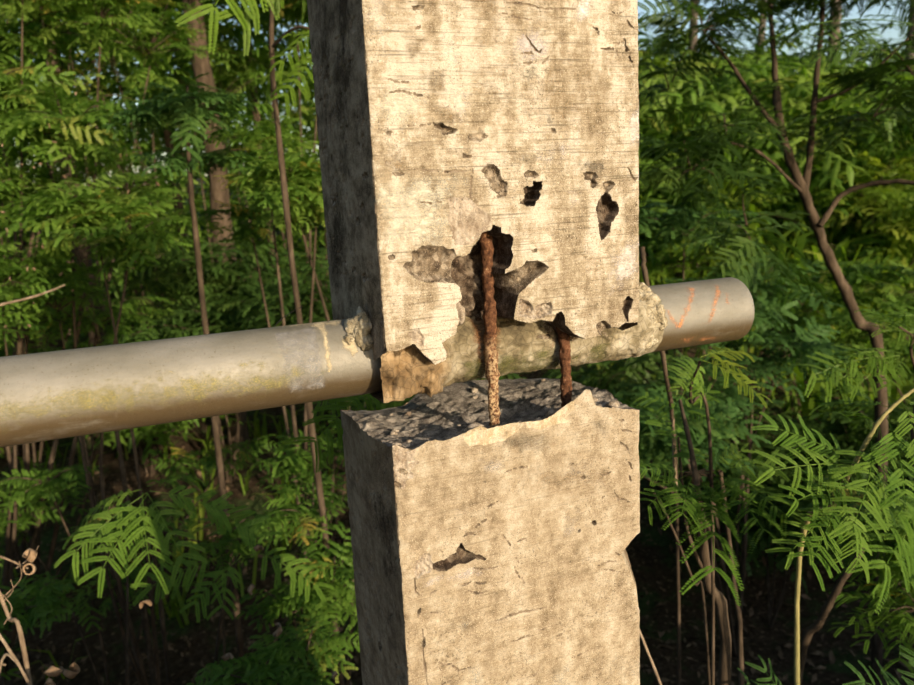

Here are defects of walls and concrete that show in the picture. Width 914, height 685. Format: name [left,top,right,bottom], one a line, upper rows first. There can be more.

spalling [405,0,426,11]
spalling [481,164,508,198]
spalling [583,171,619,240]
spalling [388,196,549,338]
spalling [544,296,636,339]
peeling [405,329,447,364]
spalling [463,401,574,446]
spalling [392,445,419,489]
spalling [412,543,486,596]